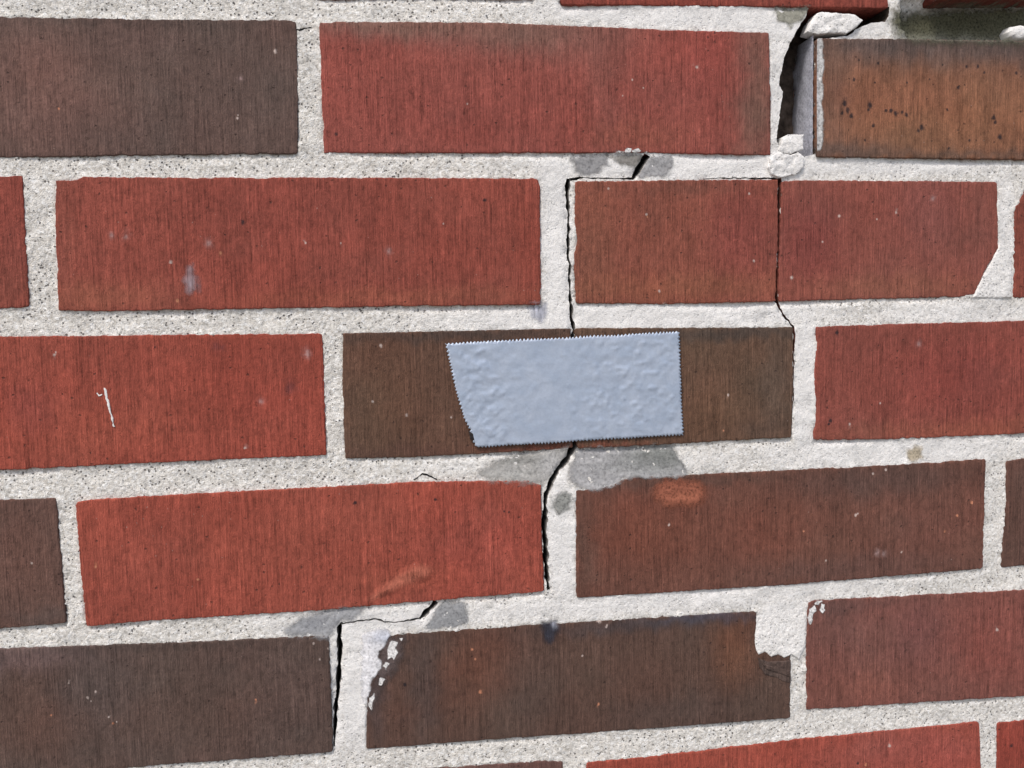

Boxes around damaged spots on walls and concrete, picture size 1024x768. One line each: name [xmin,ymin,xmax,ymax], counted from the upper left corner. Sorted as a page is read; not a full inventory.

crack [565,157,650,339]
crack [703,177,796,408]
crack [541,442,577,589]
peeling [368,638,402,710]
crack [333,601,438,746]